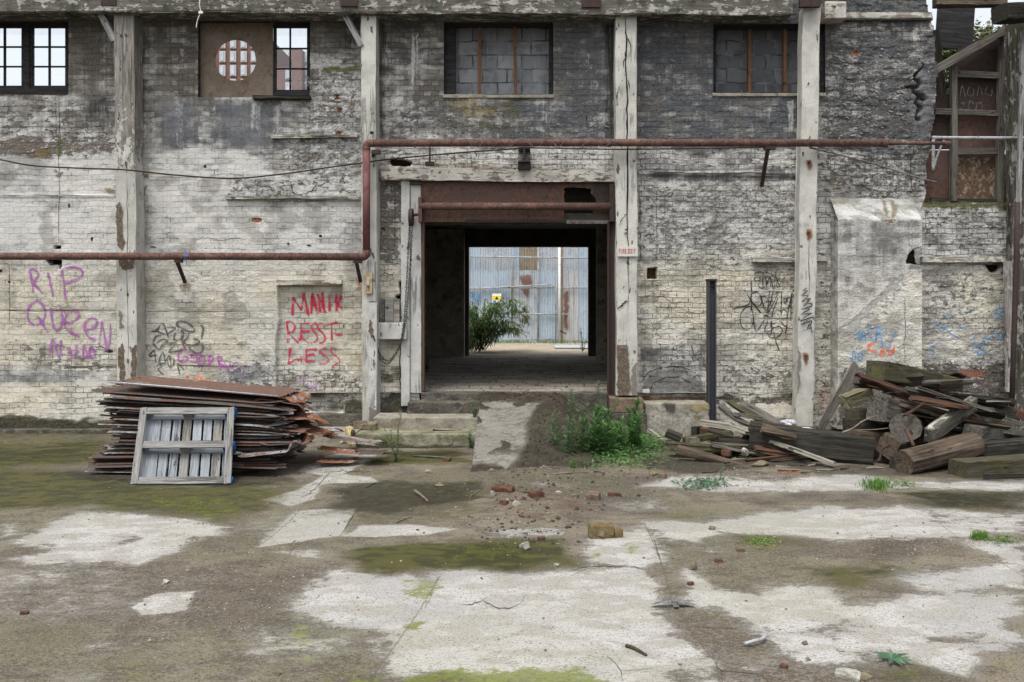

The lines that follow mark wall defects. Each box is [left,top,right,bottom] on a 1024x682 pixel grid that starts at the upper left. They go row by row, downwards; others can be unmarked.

water stain [214,103,280,145]
corrosion [924,38,1007,202]
peeling [116,202,135,270]